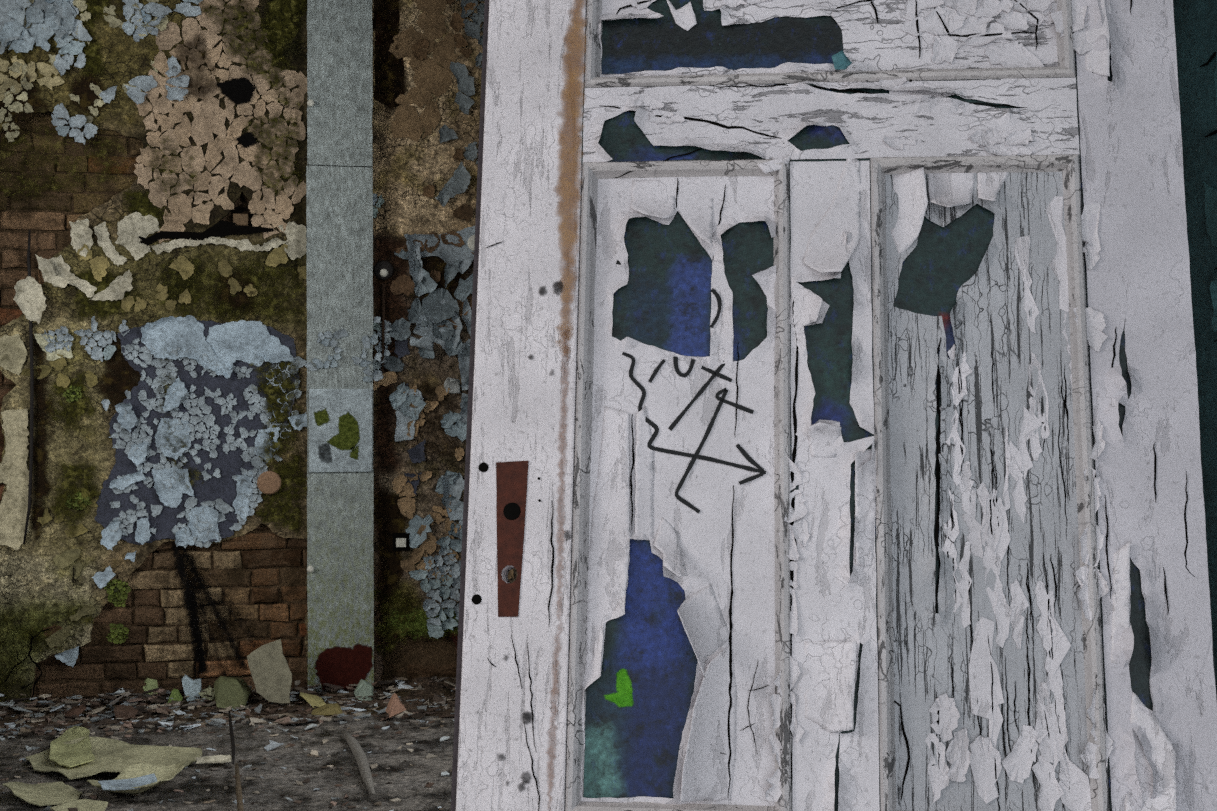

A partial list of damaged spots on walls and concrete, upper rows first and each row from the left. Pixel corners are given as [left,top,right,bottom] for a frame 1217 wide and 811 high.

crack [616,0,651,14]
crack [836,0,878,23]
crack [910,0,1039,82]
crack [716,80,873,94]
crack [969,101,1027,109]
corrosion [558,0,584,353]
crack [599,105,782,208]
spalling [0,0,476,701]
water stain [165,546,255,679]